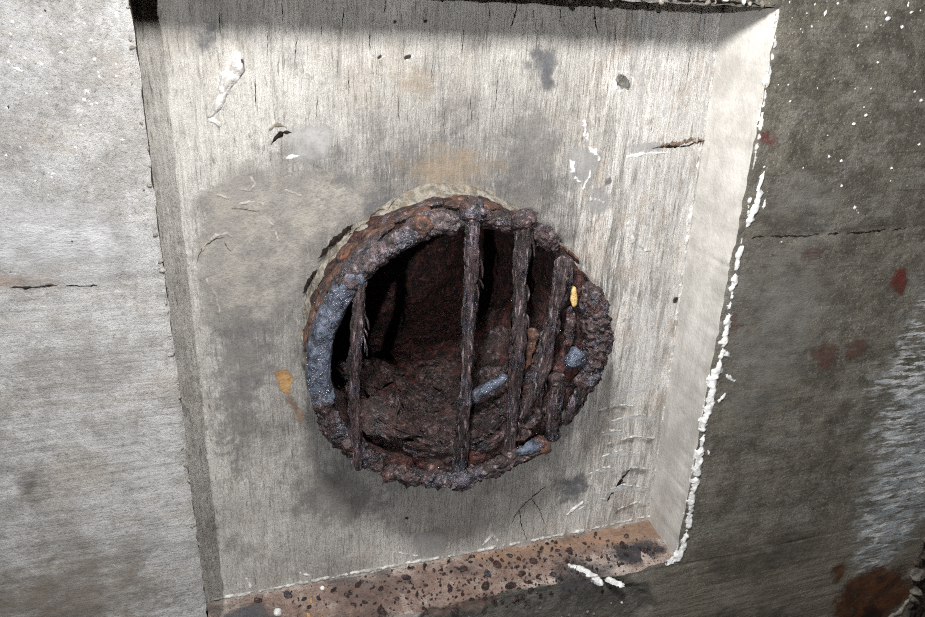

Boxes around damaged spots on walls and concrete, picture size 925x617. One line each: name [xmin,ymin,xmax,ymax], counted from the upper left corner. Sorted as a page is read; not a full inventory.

damp [746,10,779,227]
rust [466,521,659,565]
rust [570,286,578,307]
damp [612,239,821,566]
rust [832,565,911,617]
damp [855,321,925,571]